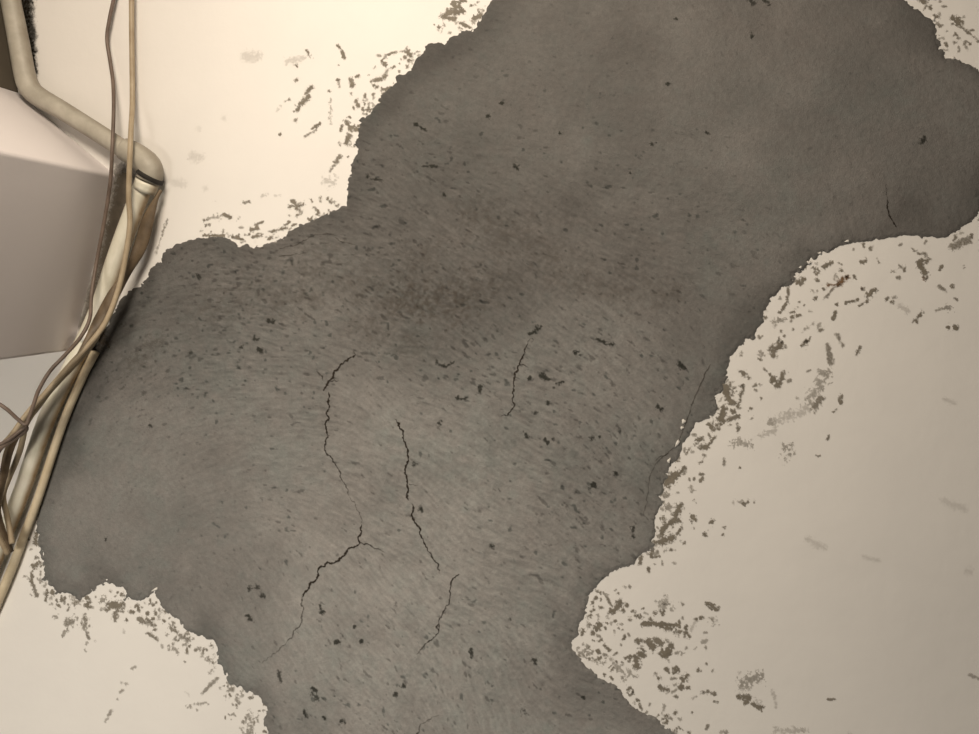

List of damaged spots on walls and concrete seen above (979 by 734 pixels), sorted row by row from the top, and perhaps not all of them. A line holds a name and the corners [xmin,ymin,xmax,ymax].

crack [321,355,355,493]
crack [505,338,533,416]
crack [288,524,378,640]
crack [395,419,459,654]